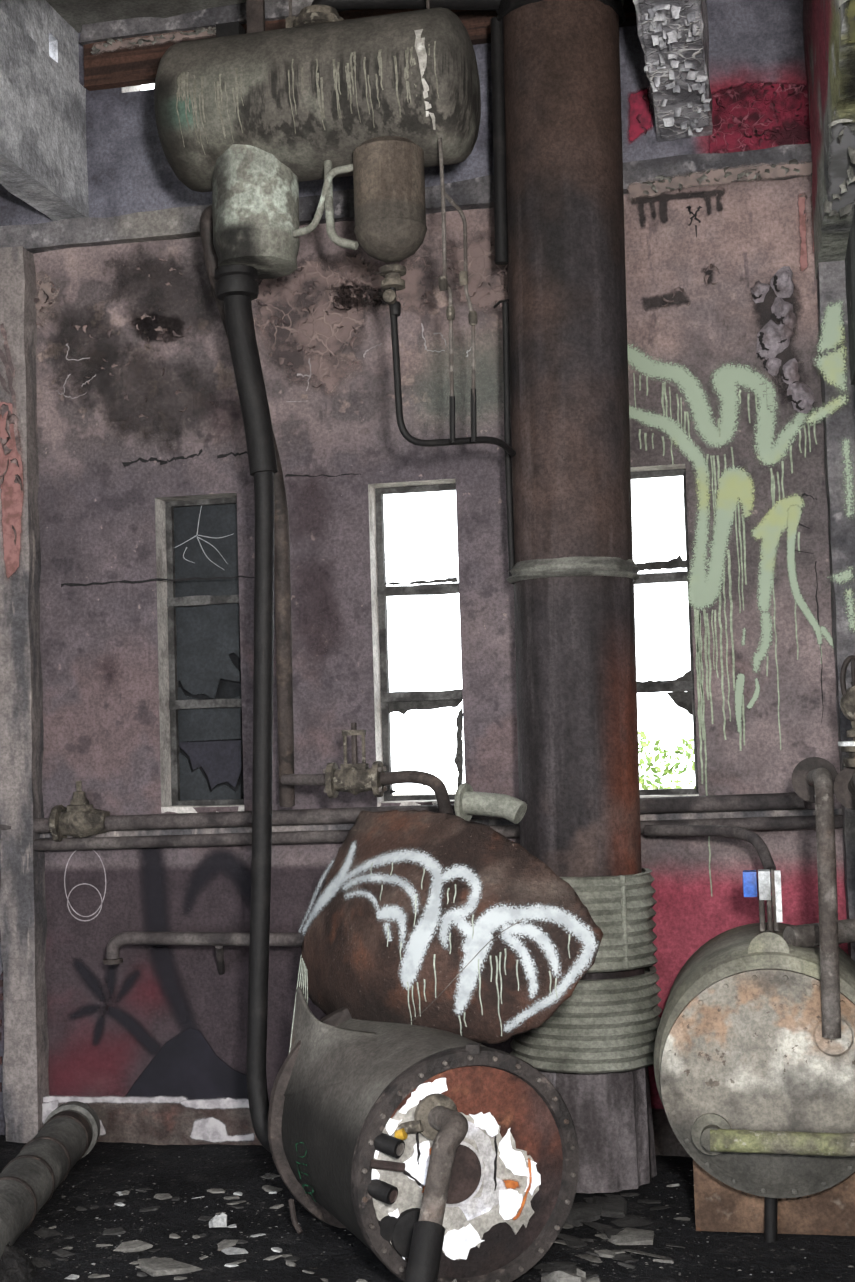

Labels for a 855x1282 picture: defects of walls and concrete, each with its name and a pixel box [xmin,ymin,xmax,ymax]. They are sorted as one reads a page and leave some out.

spalling [837,0,855,43]
peeling [628,0,812,227]
spalling [798,110,855,272]
peeling [0,323,24,578]
crack [122,449,248,469]
crack [285,471,361,479]